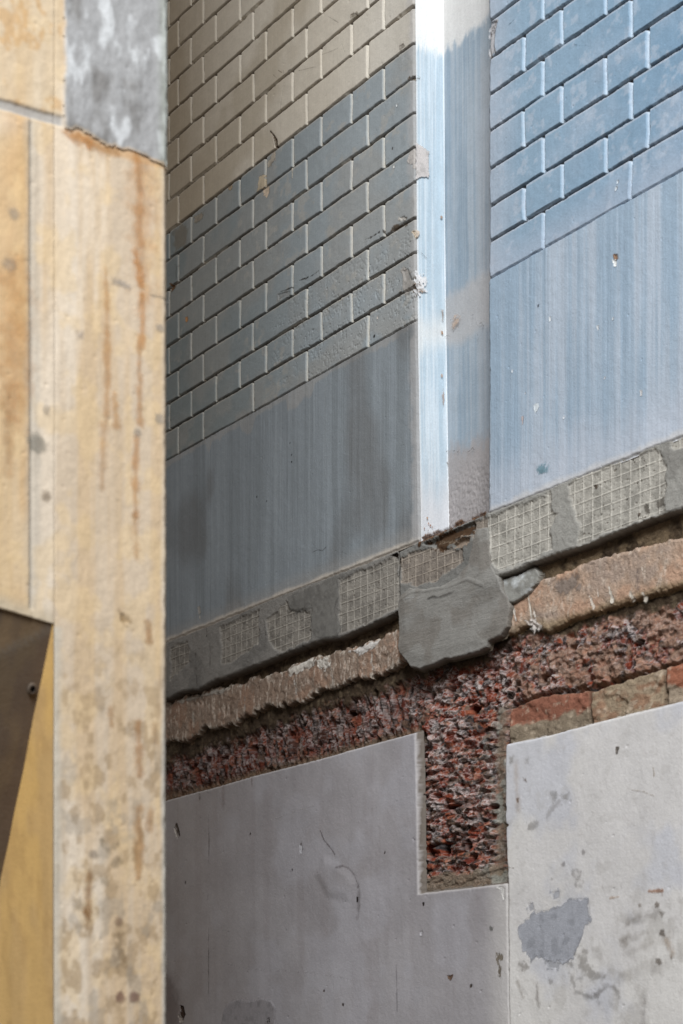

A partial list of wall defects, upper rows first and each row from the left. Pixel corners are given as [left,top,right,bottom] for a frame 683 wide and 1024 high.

spalling [539,515,683,579]
spalling [166,590,683,906]